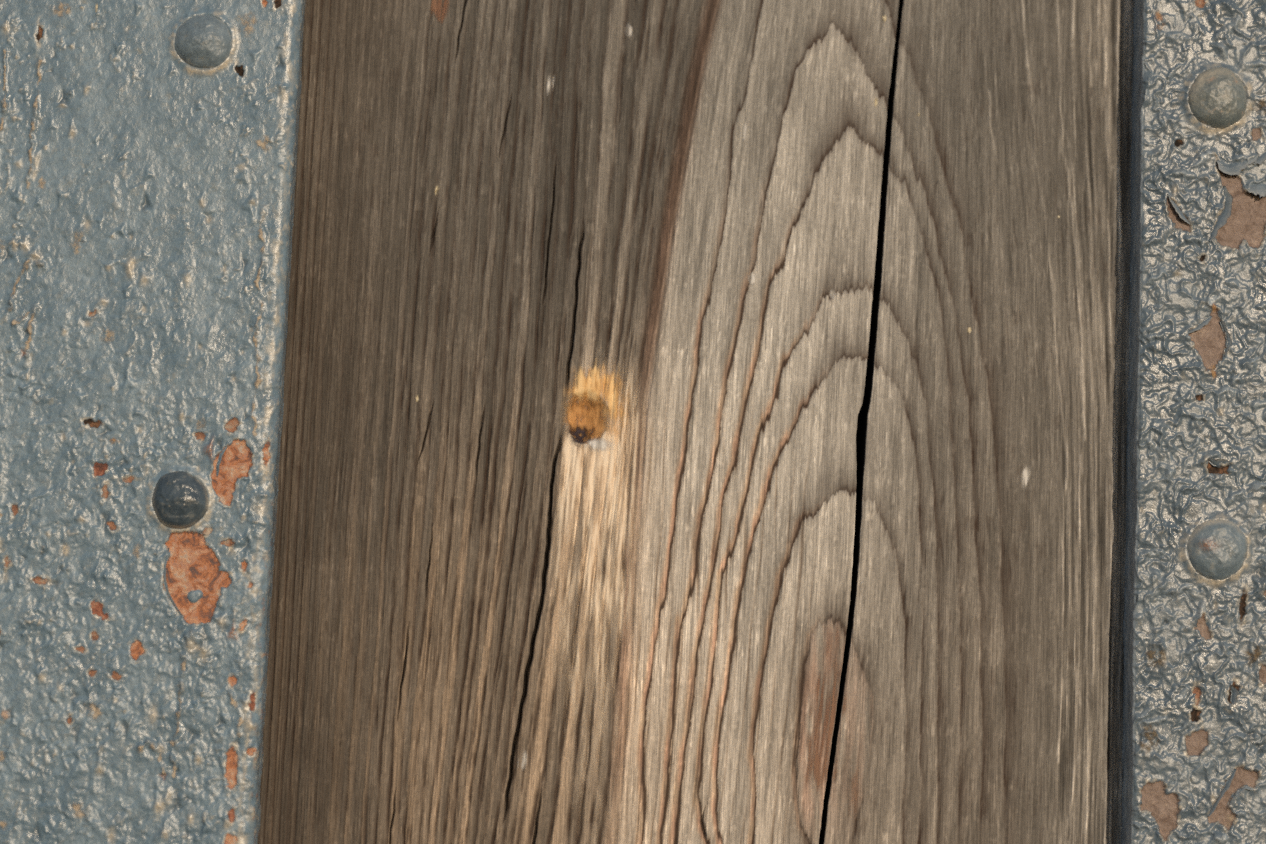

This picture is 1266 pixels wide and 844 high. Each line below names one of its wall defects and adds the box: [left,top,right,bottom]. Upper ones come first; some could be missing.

peeling [1166,194,1195,232]
peeling [1200,128,1266,261]
crack [566,225,584,386]
peeling [1187,308,1232,370]
crack [819,0,903,844]
crack [503,440,560,823]
peeling [1140,781,1181,841]
peeling [1207,767,1260,830]